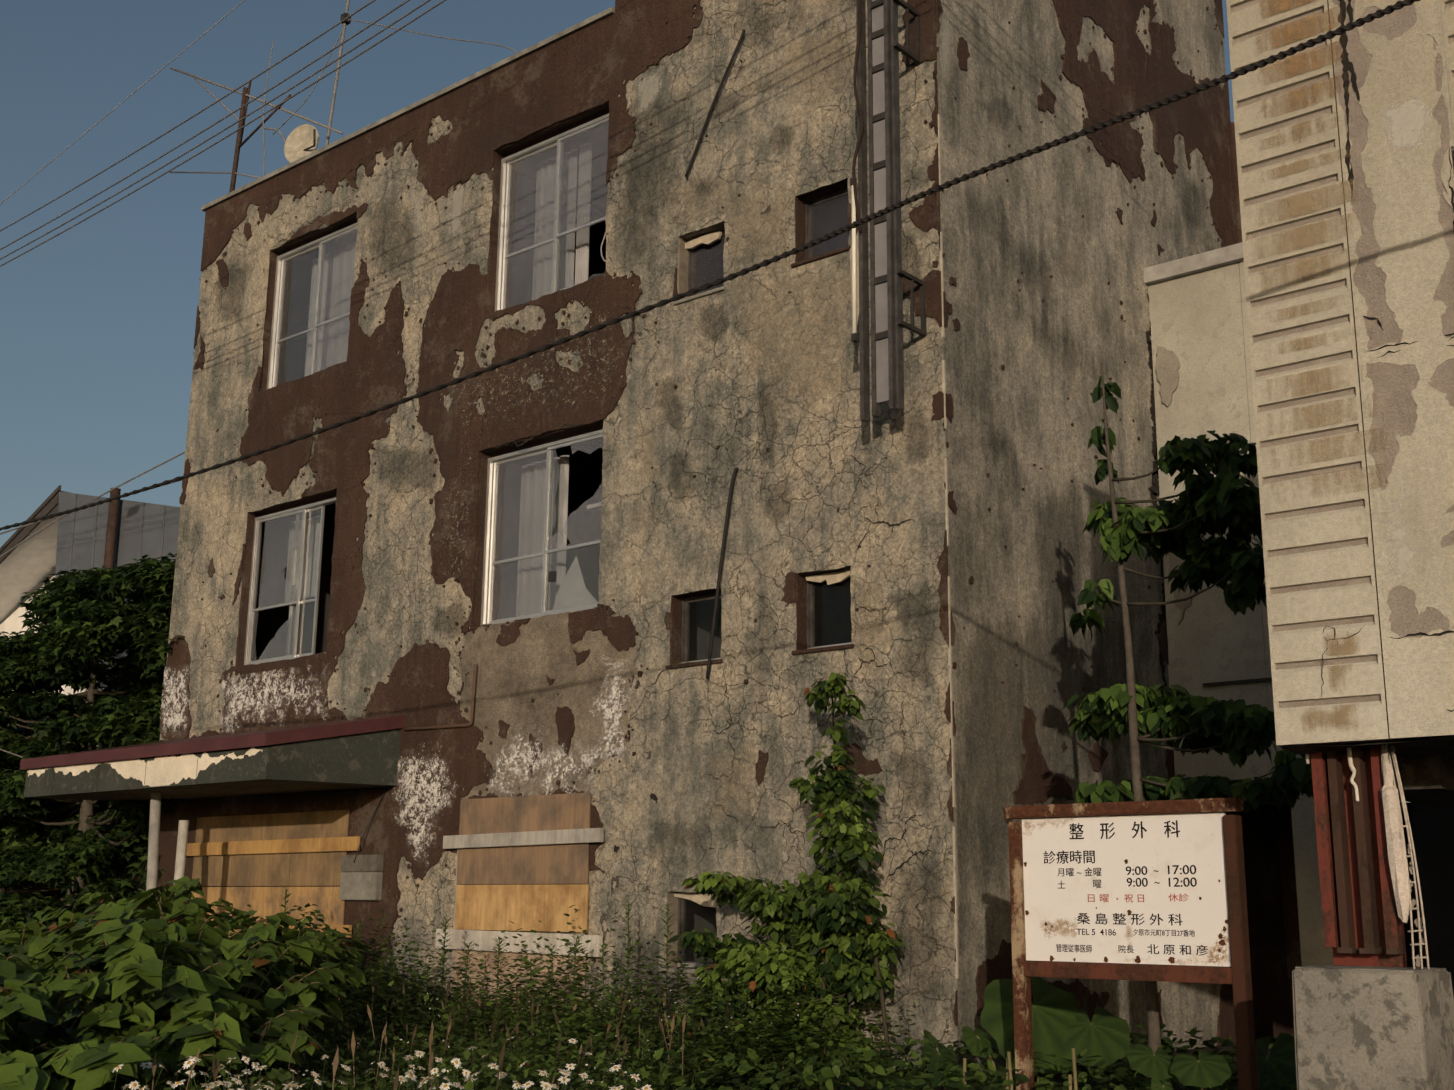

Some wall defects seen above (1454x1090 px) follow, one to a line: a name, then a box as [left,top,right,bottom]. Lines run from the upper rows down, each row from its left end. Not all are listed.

corrosion [1267,0,1339,132]
crack [1338,0,1360,197]
corrosion [1279,159,1307,177]
corrosion [1280,186,1347,282]
peeling [1332,0,1454,490]
crack [1446,147,1454,226]
crack [1363,316,1454,358]
peeling [159,0,1226,1077]
peeling [27,747,262,787]
efflorescence [221,668,322,731]
efflorescence [395,757,450,857]
efflorescence [490,658,631,793]